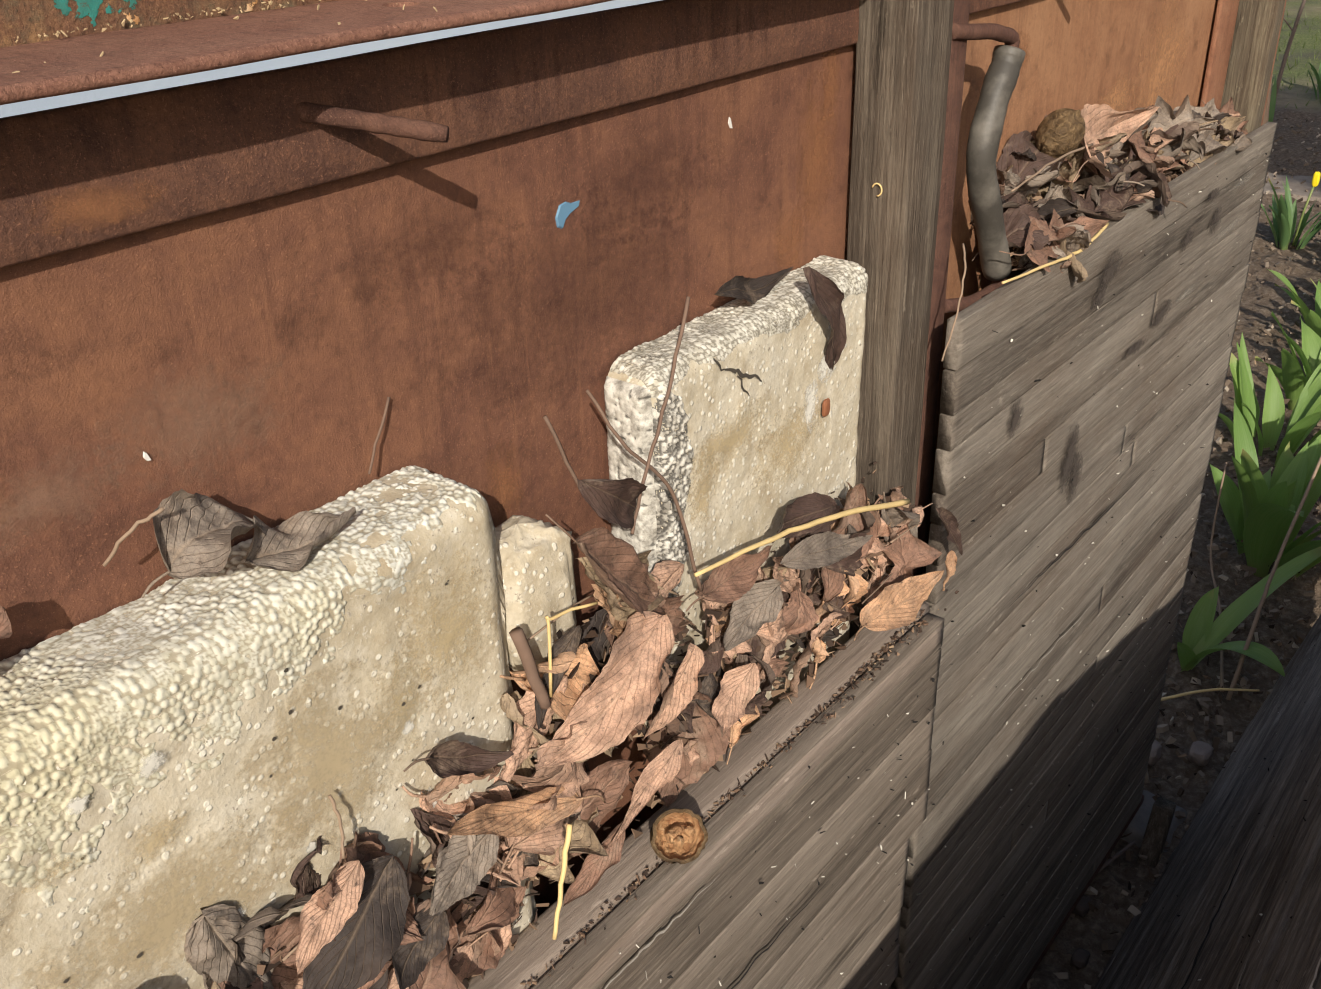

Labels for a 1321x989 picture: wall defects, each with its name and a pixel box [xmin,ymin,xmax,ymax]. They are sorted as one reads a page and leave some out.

peeling [54,0,140,27]